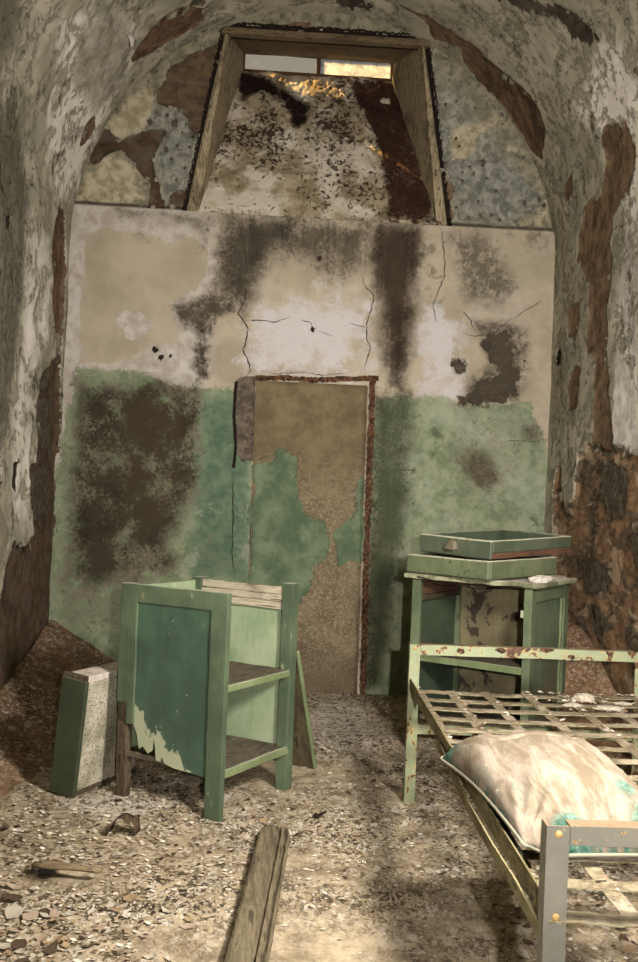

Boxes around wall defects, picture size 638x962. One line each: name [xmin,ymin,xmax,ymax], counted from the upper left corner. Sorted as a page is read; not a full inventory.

flaking render [80,44,221,210]
flaking render [128,0,211,62]
flaking render [400,5,545,159]
flaking render [0,203,67,691]
mould [73,383,196,580]
damp [174,216,418,688]
peeling [242,448,366,605]
crack [237,238,374,382]
crack [432,229,446,321]
damp [469,324,526,401]
crack [463,302,539,337]
flaking render [550,121,638,714]